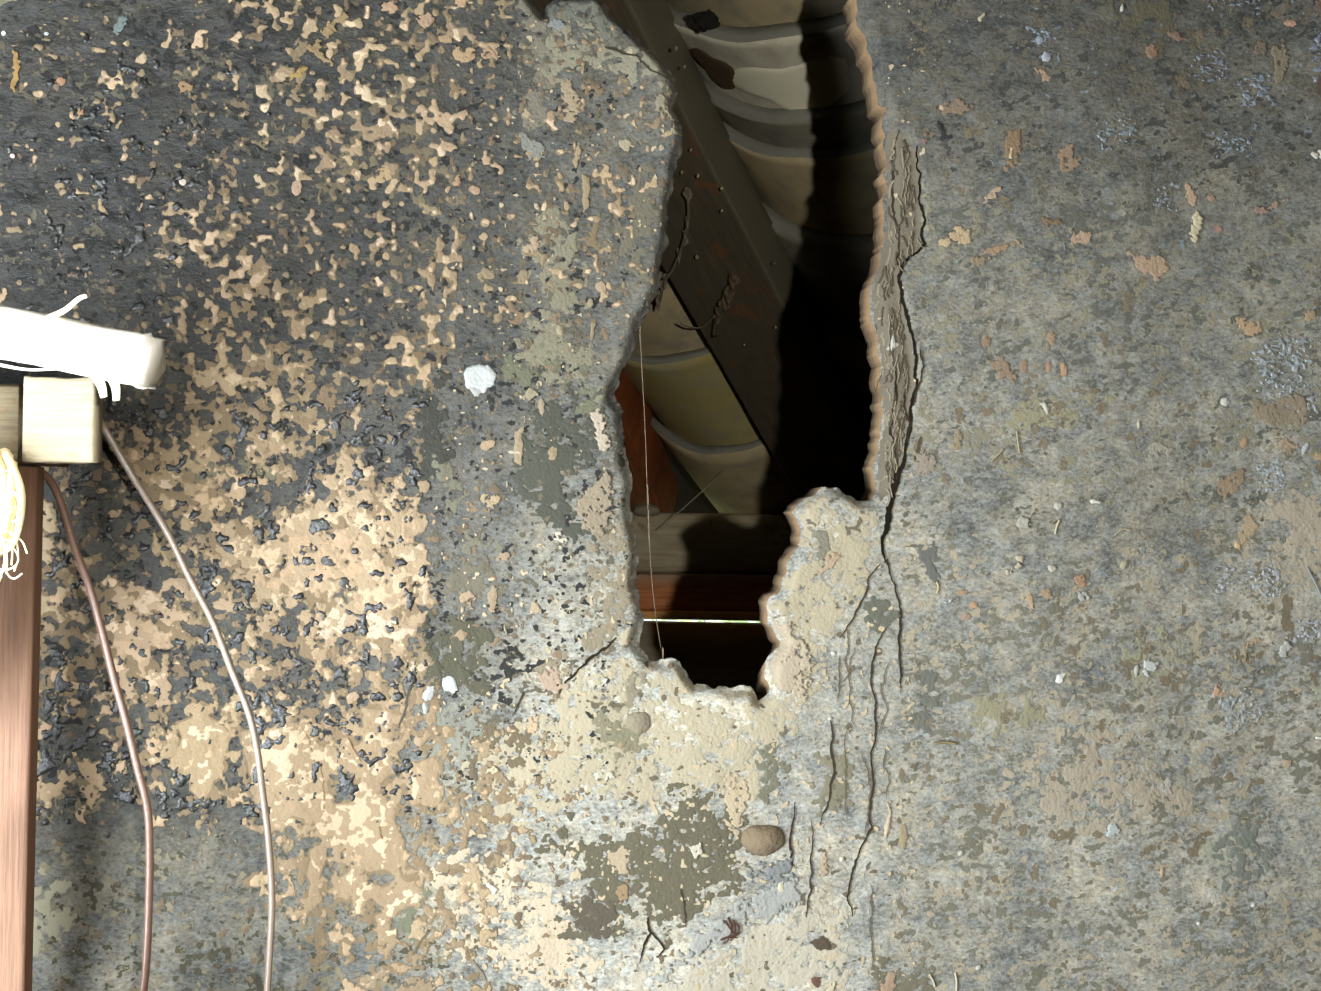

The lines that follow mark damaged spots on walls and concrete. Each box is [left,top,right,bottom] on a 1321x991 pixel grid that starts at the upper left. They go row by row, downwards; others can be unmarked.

peeling [0,17,68,97]
peeling [0,205,48,233]
peeling [36,0,757,991]
leakage [409,369,463,506]
leakage [493,365,625,551]
crack [789,130,926,966]
leakage [420,607,501,699]
leakage [590,671,663,766]
peeling [769,601,861,700]
leakage [533,731,791,950]